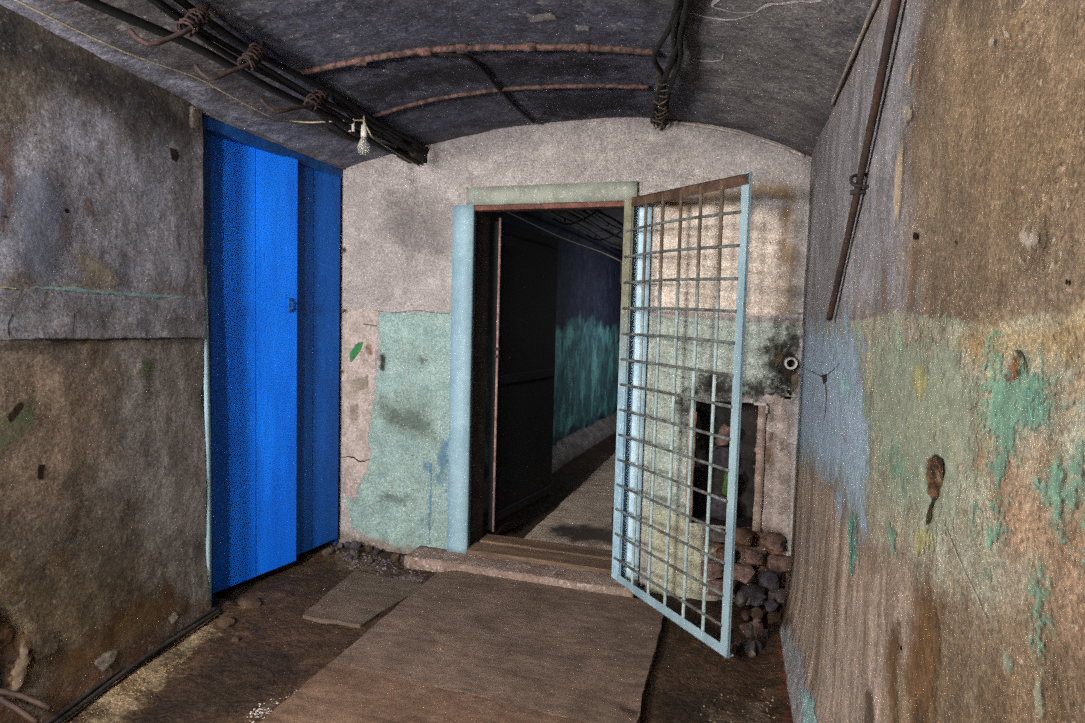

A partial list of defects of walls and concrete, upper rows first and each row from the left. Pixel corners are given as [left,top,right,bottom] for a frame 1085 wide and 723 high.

peeling [31,282,185,299]
flaking render [340,308,449,500]
peeling [708,307,1085,603]
peeling [1028,563,1051,660]
flaking render [0,614,58,712]
peeling [1034,680,1042,716]